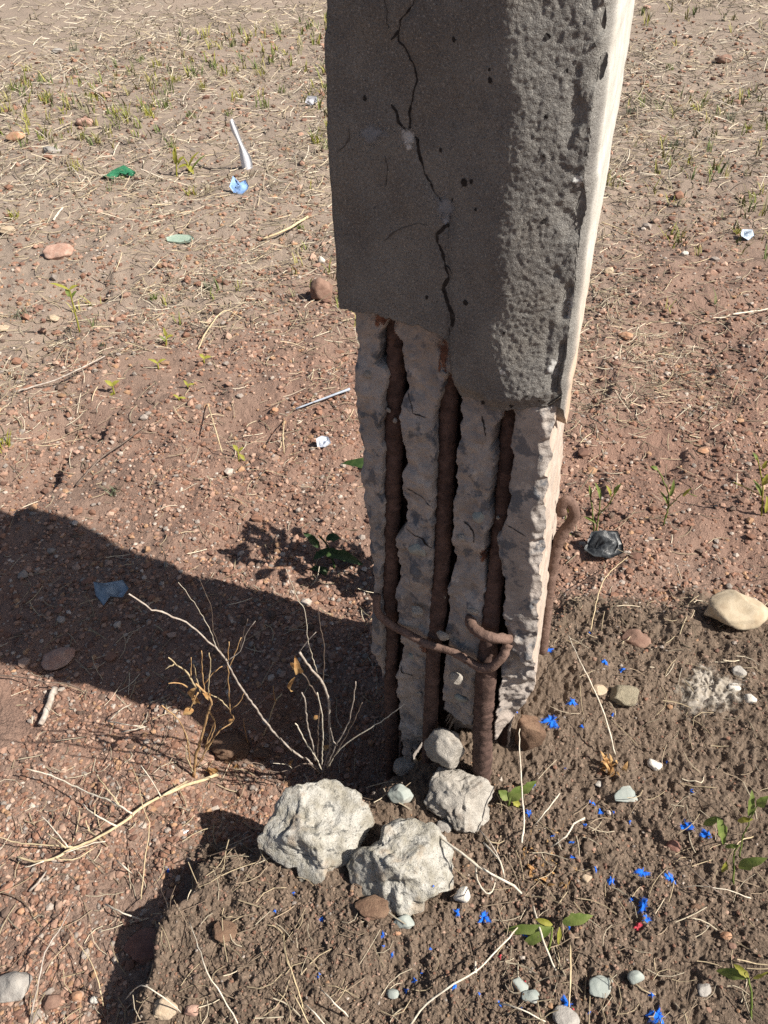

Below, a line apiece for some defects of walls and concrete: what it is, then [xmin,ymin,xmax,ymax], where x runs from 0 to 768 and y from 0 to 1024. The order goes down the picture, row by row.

crack [383,0,455,338]
spalling [553,344,564,388]
spalling [354,312,556,761]